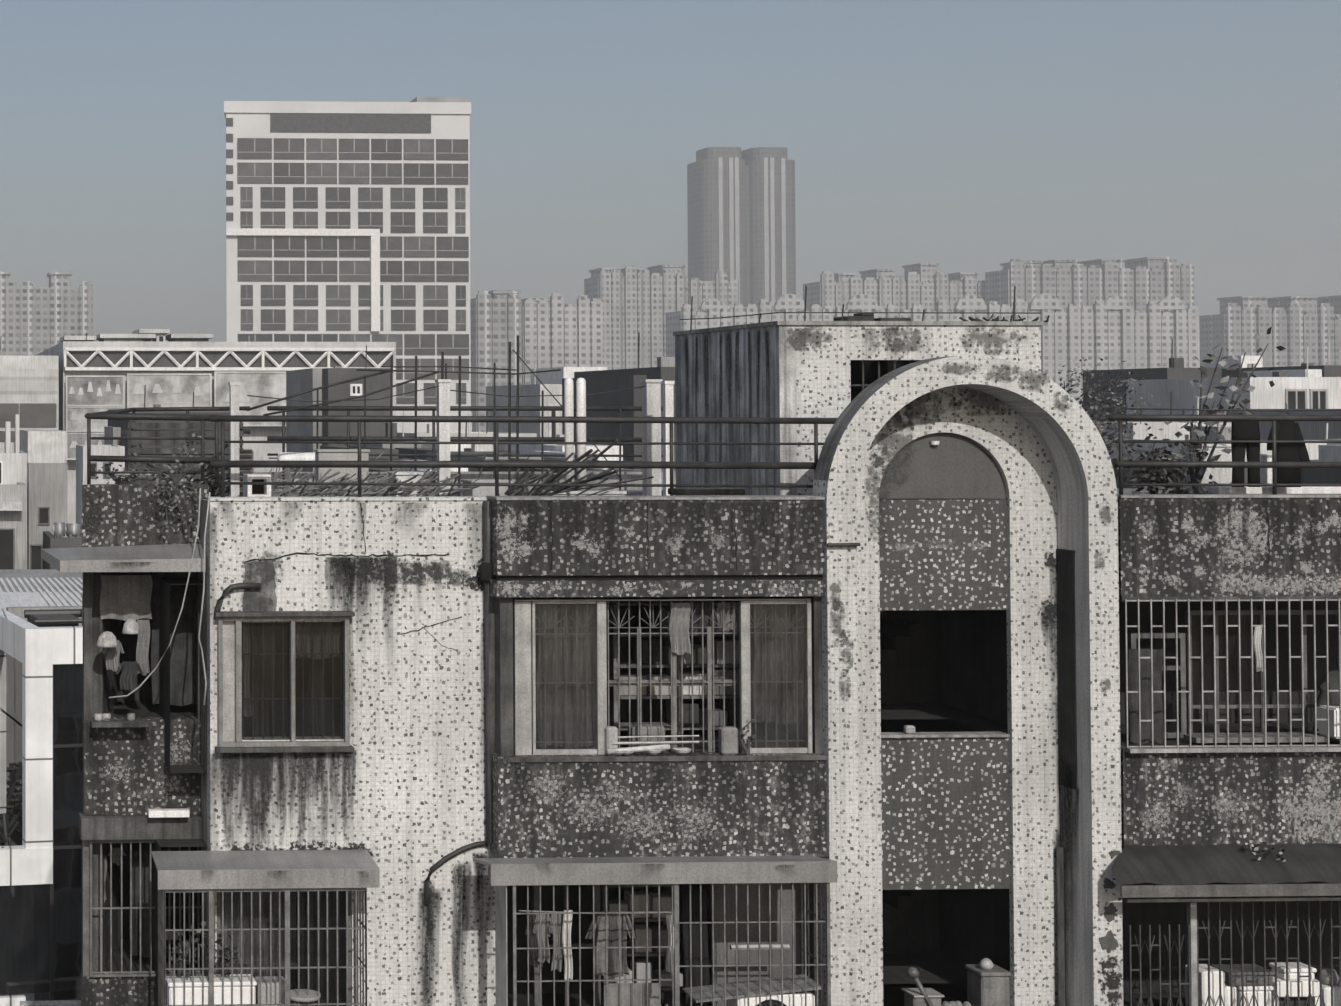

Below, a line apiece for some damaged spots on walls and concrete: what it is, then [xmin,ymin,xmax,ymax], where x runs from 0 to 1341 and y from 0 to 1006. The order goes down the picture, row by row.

leakage [685,331,770,427]
leakage [1120,500,1330,538]
leakage [326,552,484,637]
leakage [194,724,380,857]
leakage [1055,696,1079,870]
leakage [420,854,490,1000]